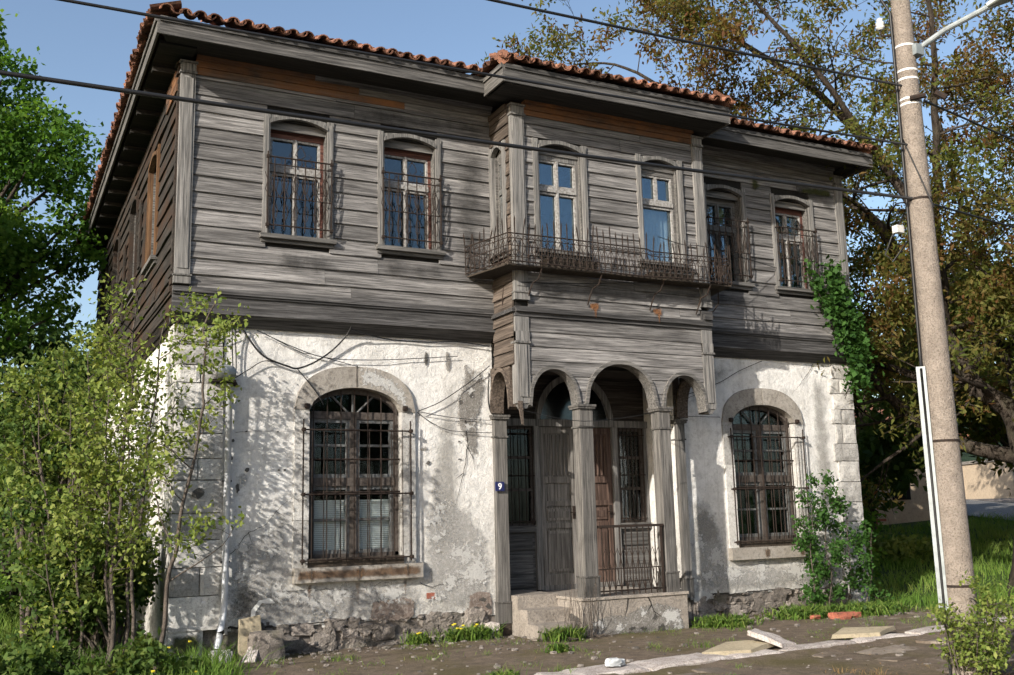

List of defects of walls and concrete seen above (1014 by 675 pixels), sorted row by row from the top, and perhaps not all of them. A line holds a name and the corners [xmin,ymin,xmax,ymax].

peeling [456,365,485,455]
peeling [232,488,493,621]
peeling [693,513,840,602]